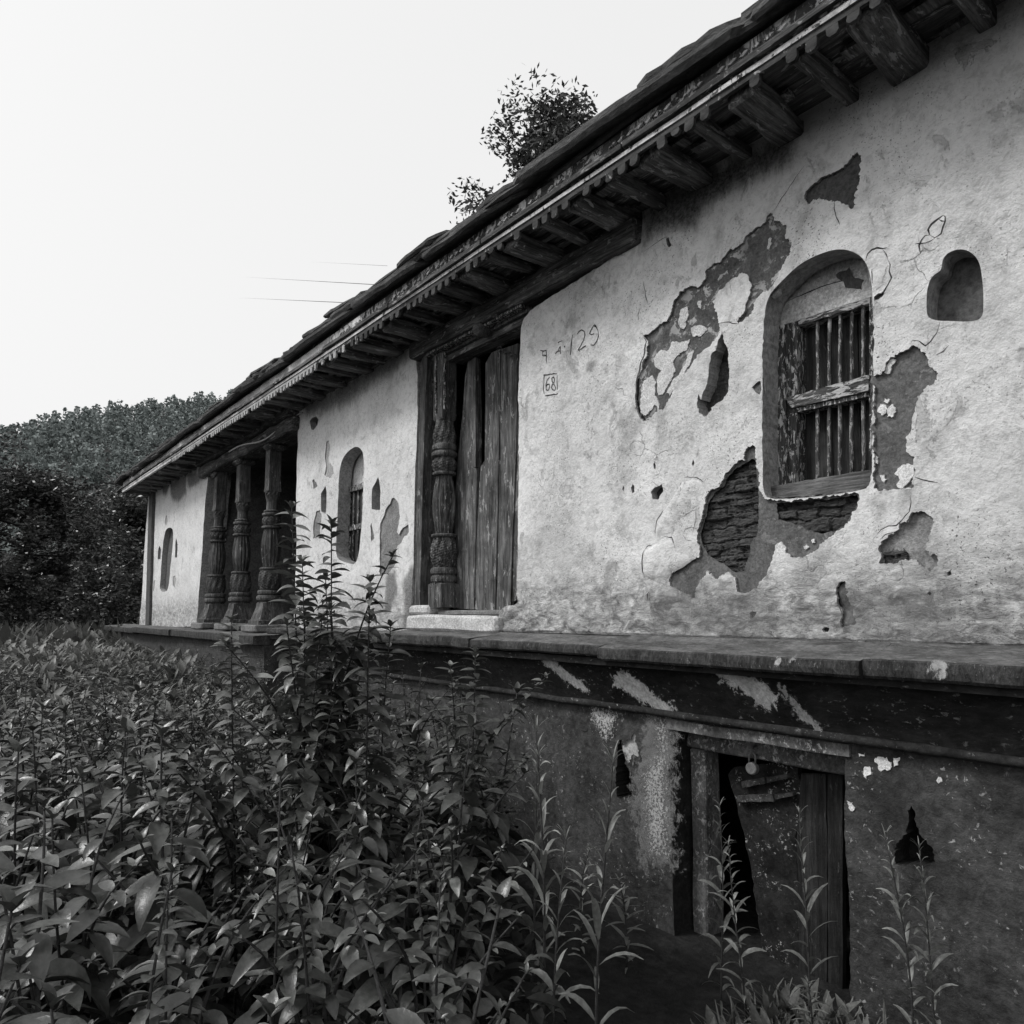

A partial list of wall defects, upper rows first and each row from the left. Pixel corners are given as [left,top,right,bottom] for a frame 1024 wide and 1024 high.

peeling [806,154,861,209]
peeling [638,214,791,420]
peeling [870,346,938,491]
peeling [371,498,409,573]
peeling [671,446,860,598]
peeling [837,582,856,627]
peeling [880,511,952,575]
leakage [612,668,686,877]